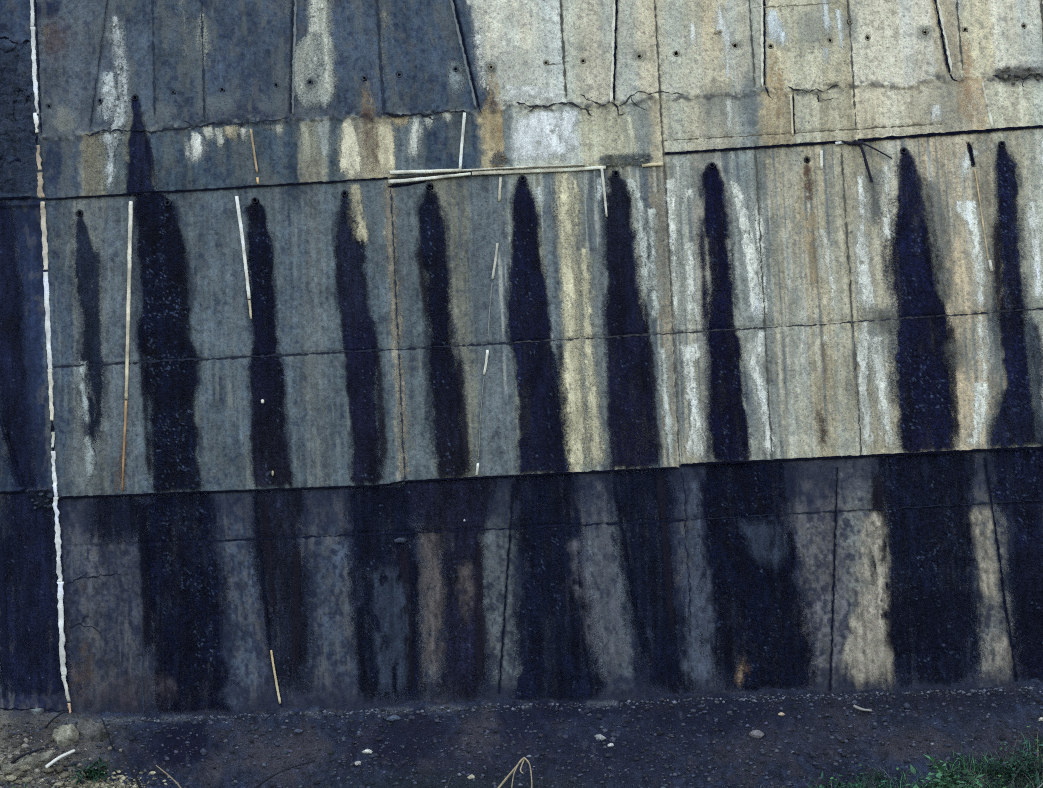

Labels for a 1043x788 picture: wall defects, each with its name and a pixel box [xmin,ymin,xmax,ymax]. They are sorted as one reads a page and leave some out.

crack [0,36,31,53]
crack [0,88,32,122]
damp [186,126,246,159]
damp [294,0,337,107]
damp [506,85,579,162]
crack [517,91,683,116]
damp [0,201,69,694]
damp [71,215,108,476]
damp [85,16,233,712]
damp [246,202,317,690]
damp [299,112,817,701]
damp [843,144,1043,685]